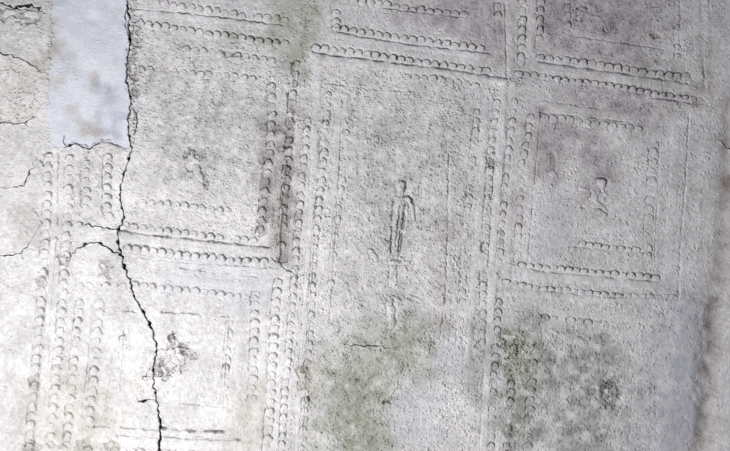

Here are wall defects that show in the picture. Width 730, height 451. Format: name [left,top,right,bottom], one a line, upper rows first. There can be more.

crack [0,2,43,12]
crack [71,2,163,451]